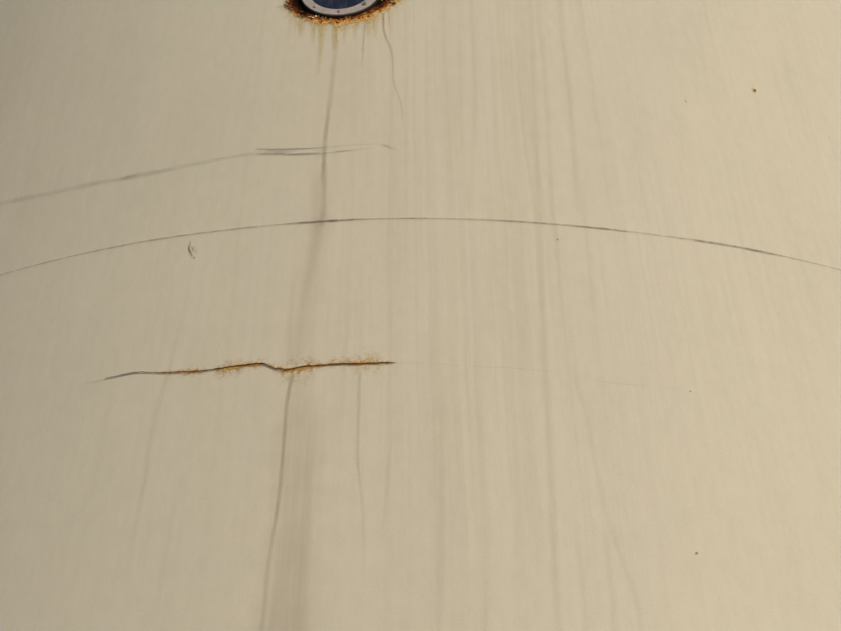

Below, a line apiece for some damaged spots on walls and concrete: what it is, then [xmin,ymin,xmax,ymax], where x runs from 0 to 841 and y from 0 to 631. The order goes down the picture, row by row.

corrosion [285,0,401,39]
crack [105,360,395,379]